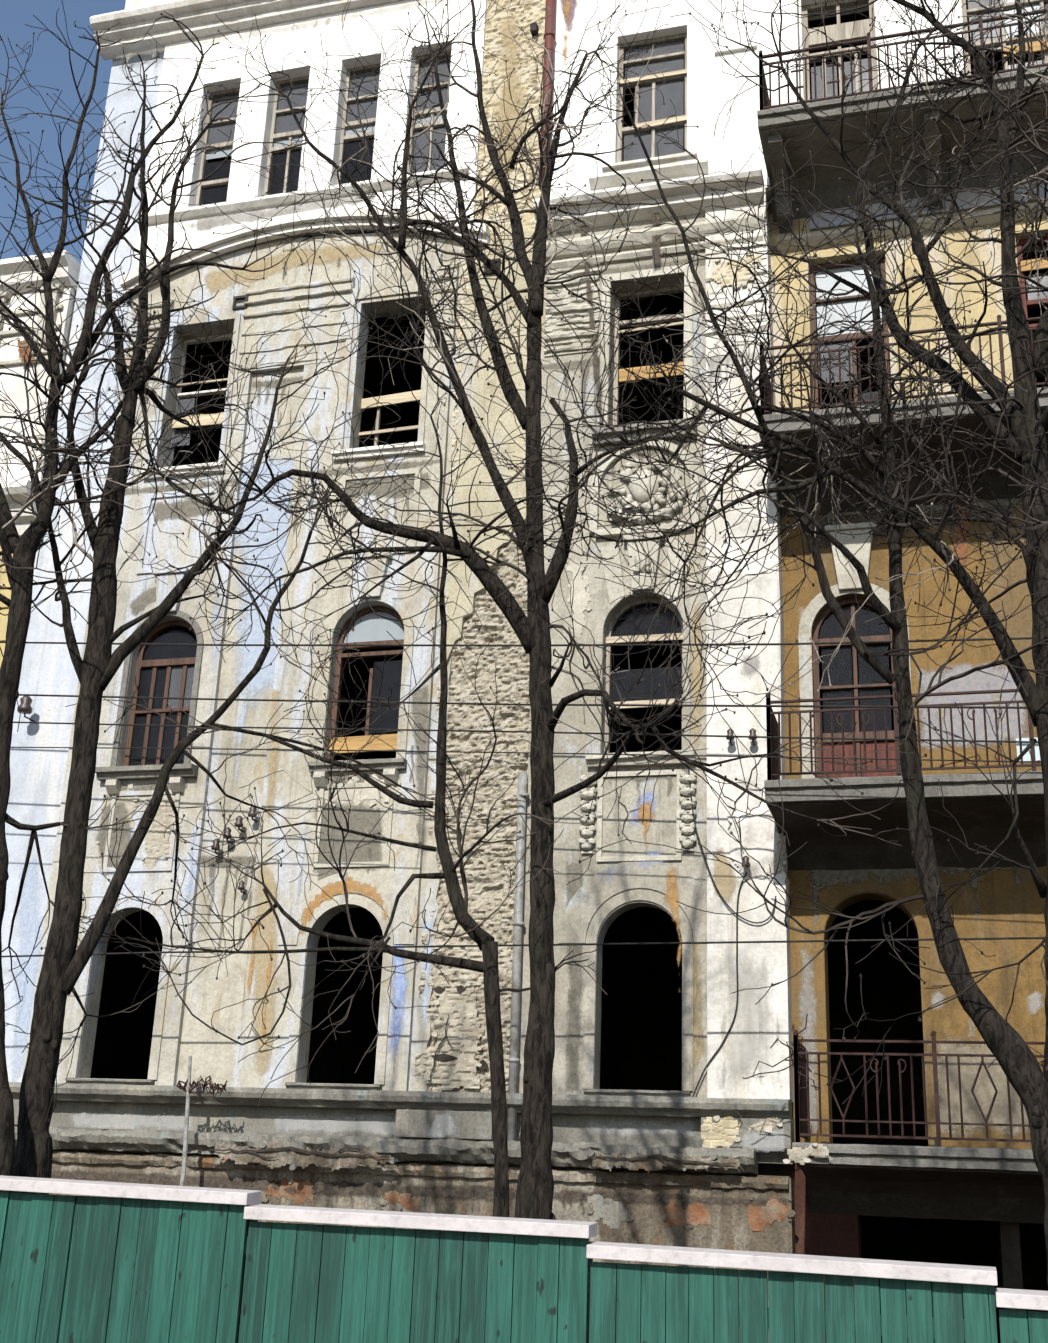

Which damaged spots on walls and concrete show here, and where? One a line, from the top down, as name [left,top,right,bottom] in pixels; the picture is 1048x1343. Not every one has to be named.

corrosion [561,0,577,61]
leakage [125,442,313,776]
peeling [919,664,1027,749]
spalling [424,982,488,1090]
spalling [215,1142,395,1204]
peeling [379,1190,420,1210]
peeling [586,1194,634,1229]
spalling [586,1116,783,1173]
peeling [663,1199,711,1228]
peeling [748,1197,796,1231]
spalling [783,1143,833,1165]